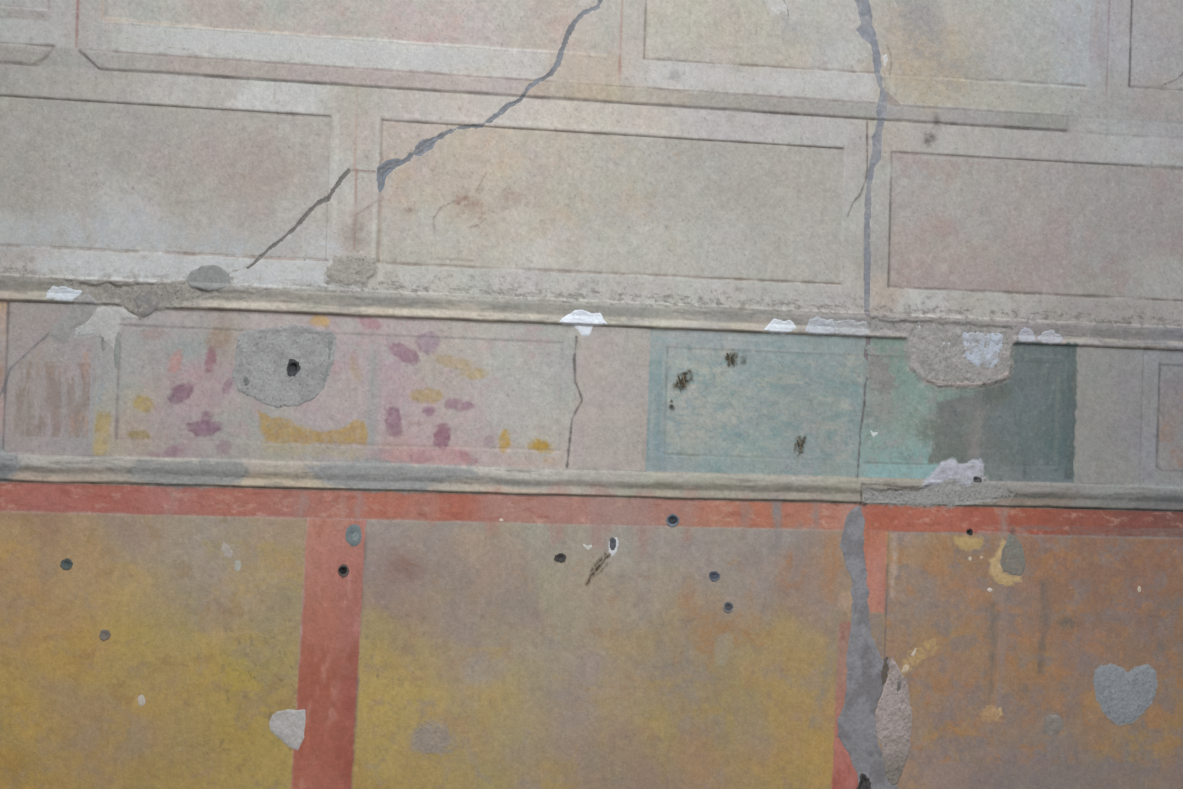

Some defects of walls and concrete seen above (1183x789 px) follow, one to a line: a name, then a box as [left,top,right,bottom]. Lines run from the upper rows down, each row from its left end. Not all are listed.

crack [228,0,603,274]
crack [846,0,920,507]
spalling [46,265,230,368]
crack [565,335,584,469]
peeling [559,310,607,337]
spalling [764,312,1063,395]
spalling [859,456,1018,511]
spalling [952,524,1026,588]
flaking render [875,635,942,785]